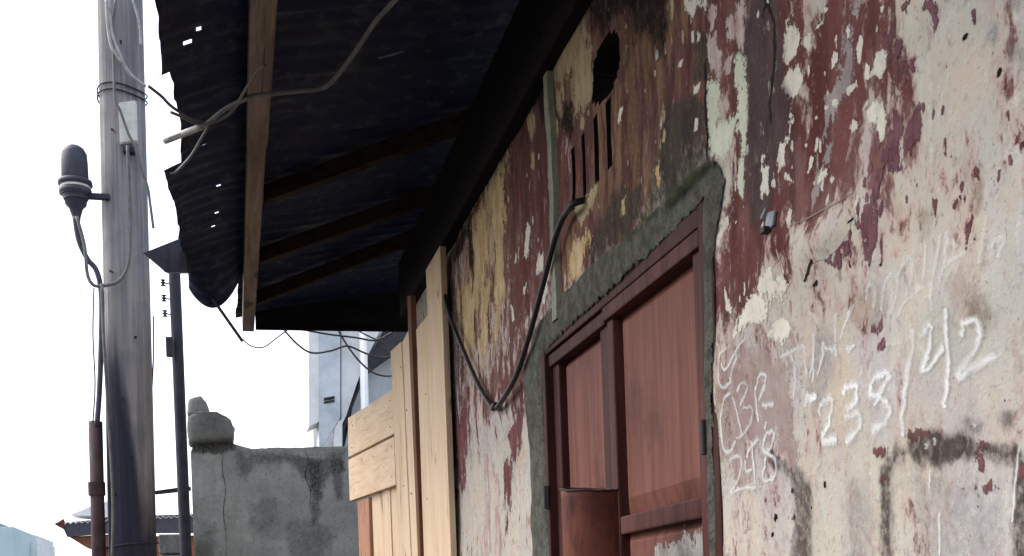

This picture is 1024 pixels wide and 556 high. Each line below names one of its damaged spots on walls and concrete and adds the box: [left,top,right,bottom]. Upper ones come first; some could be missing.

peeling [456,162,551,373]
damp [562,102,574,140]
peeling [553,11,593,138]
peeling [568,183,599,281]
damp [589,97,707,265]
damp [630,0,668,53]
damp [695,35,709,80]
peeling [724,265,795,371]
peeling [654,0,920,208]
peeling [832,99,952,270]
crack [222,460,232,532]
damp [880,428,1024,556]